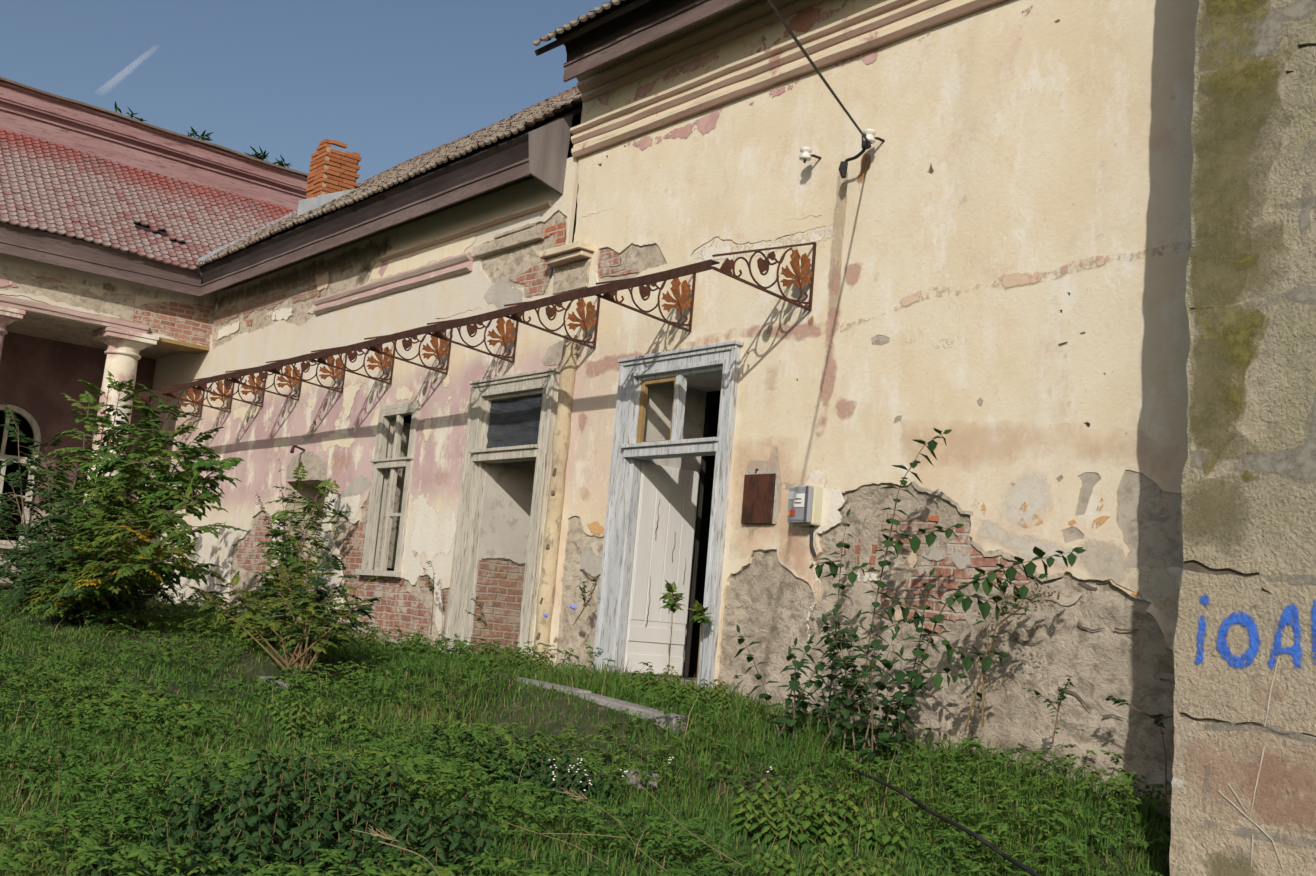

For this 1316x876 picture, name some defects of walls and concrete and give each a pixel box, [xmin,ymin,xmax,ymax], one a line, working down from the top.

peeling [634,51,720,100]
peeling [756,0,847,52]
peeling [834,48,878,66]
peeling [627,108,722,150]
spalling [0,223,476,350]
spalling [481,211,567,298]
spalling [597,244,667,282]
spalling [228,511,273,617]
spalling [327,491,457,650]
flaking render [469,560,525,659]
spalling [546,516,605,673]
spalling [717,470,1184,819]